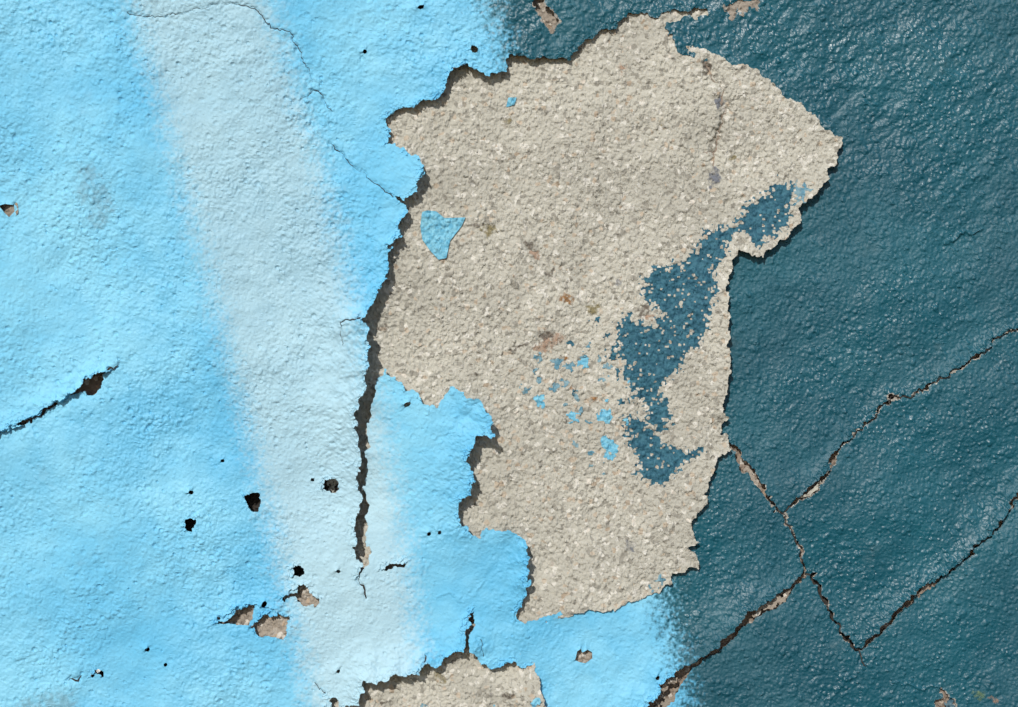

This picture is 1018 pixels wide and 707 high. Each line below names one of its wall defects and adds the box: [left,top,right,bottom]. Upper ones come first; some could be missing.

peeling [533,0,559,33]
peeling [307,7,843,707]
peeling [0,363,119,432]
crack [608,328,1018,707]
peeling [282,585,319,607]
peeling [217,605,290,640]
peeling [934,689,955,707]